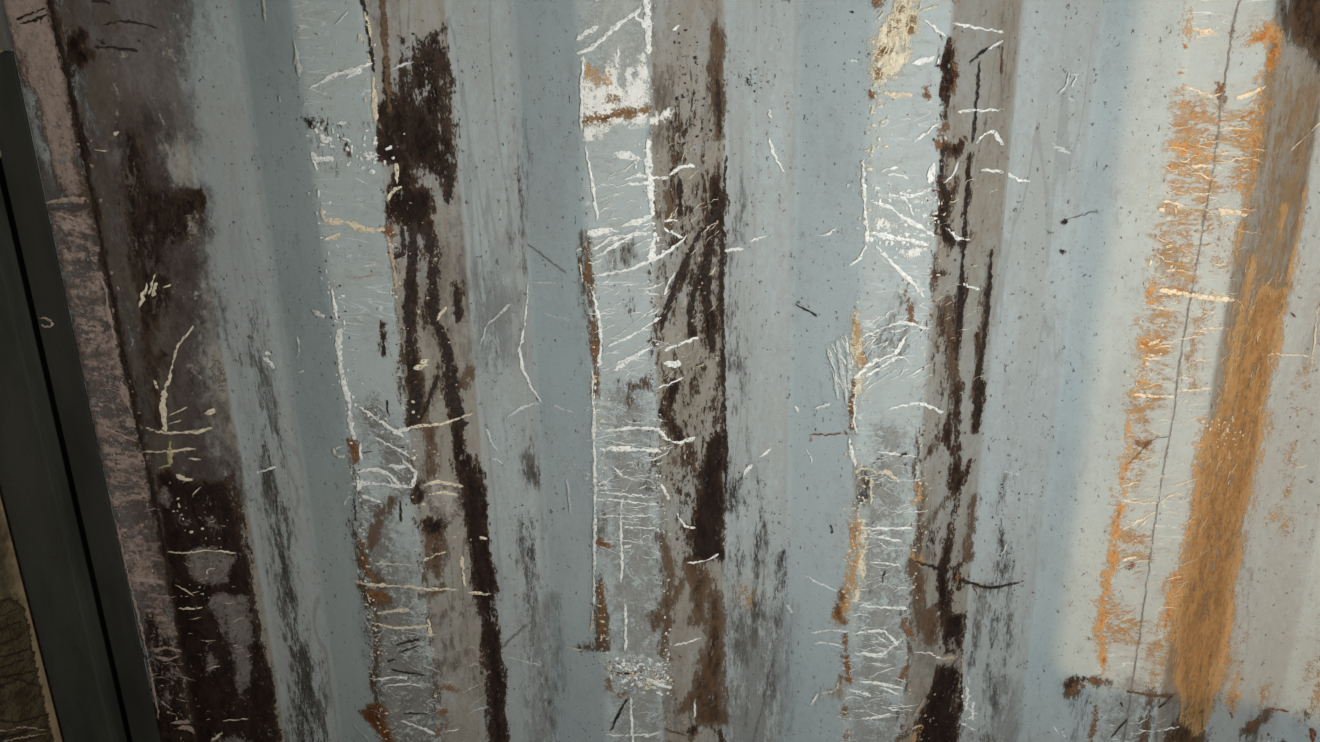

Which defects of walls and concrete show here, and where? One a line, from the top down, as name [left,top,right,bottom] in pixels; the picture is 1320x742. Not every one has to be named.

rust [95,108,287,742]
rust [332,411,363,465]
rust [348,0,511,742]
rust [566,13,731,742]
rust [820,501,870,741]
rust [844,282,919,466]
peeling [854,430,927,507]
peeling [847,0,952,413]
peeling [895,521,922,742]
rust [896,127,1030,742]
rust [1062,0,1320,742]